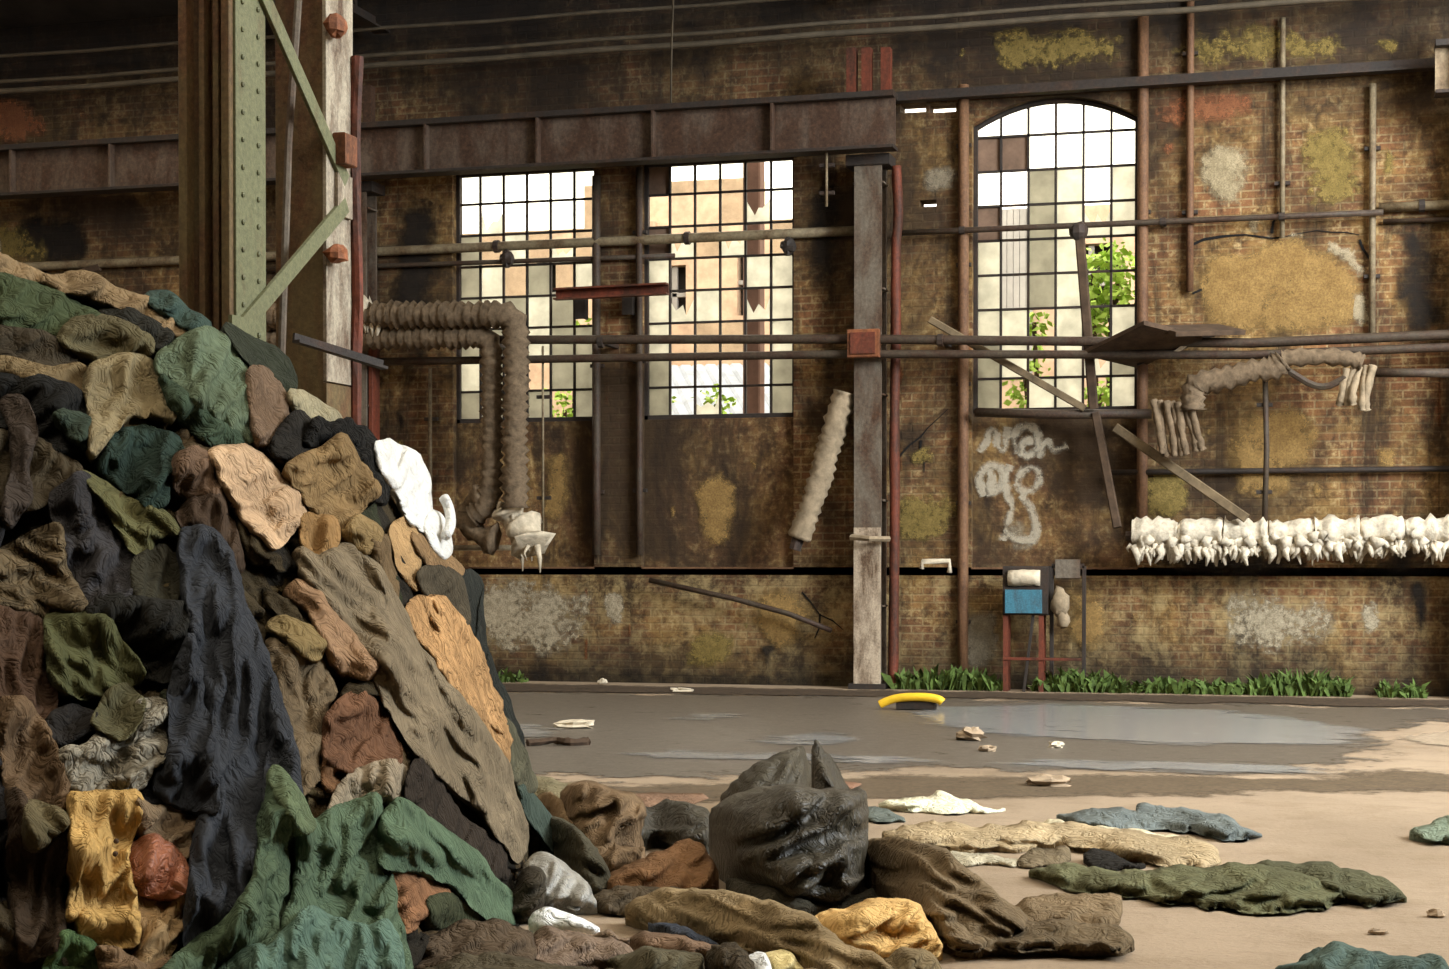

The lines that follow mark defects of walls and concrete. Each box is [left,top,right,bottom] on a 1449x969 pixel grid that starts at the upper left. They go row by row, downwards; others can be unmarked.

peeling [1201,146,1247,200]
peeling [1201,234,1369,333]
water stain [1393,223,1443,344]